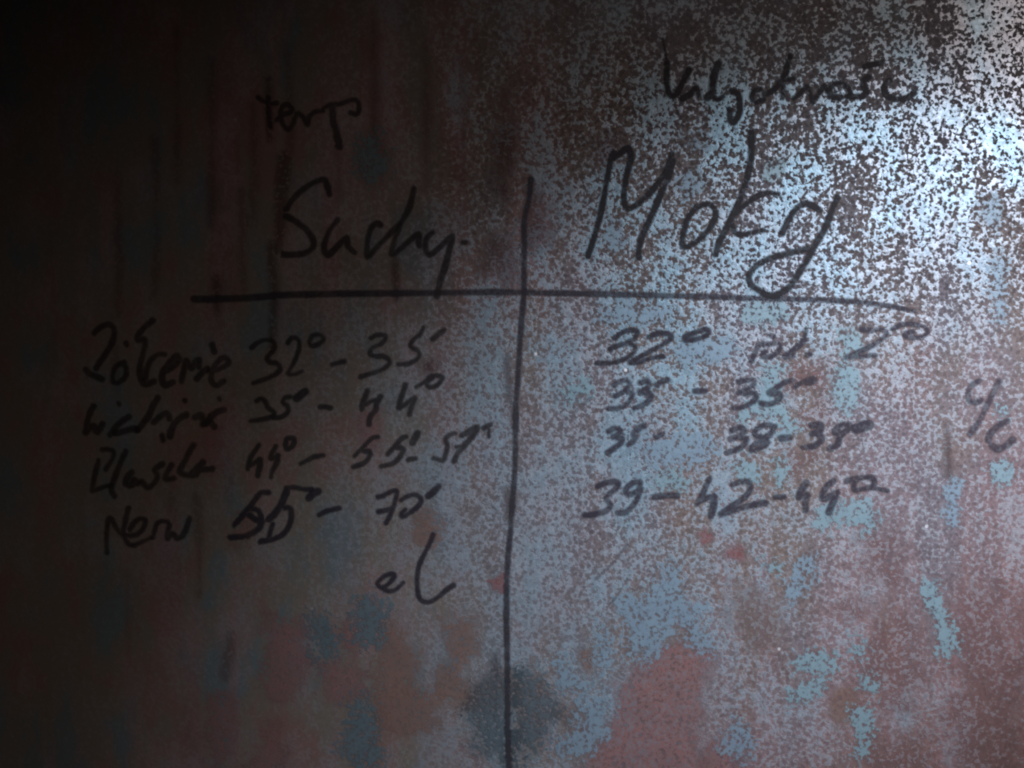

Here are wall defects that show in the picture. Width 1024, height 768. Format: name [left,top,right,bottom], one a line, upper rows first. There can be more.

corrosion [865,618,922,711]
corrosion [941,582,1023,768]